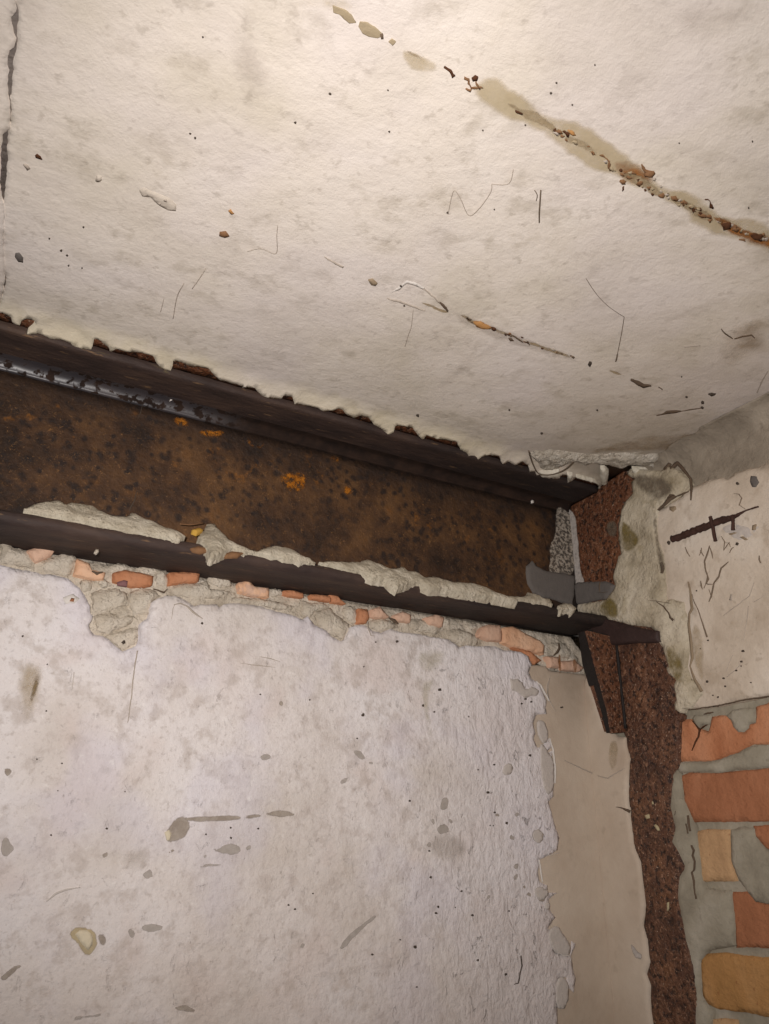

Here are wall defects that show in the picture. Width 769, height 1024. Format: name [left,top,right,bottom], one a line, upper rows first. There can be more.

crack [333,5,769,246]
corrosion [283,473,305,491]
crack [657,461,693,511]
corrosion [224,551,243,559]
peeling [0,544,653,1024]